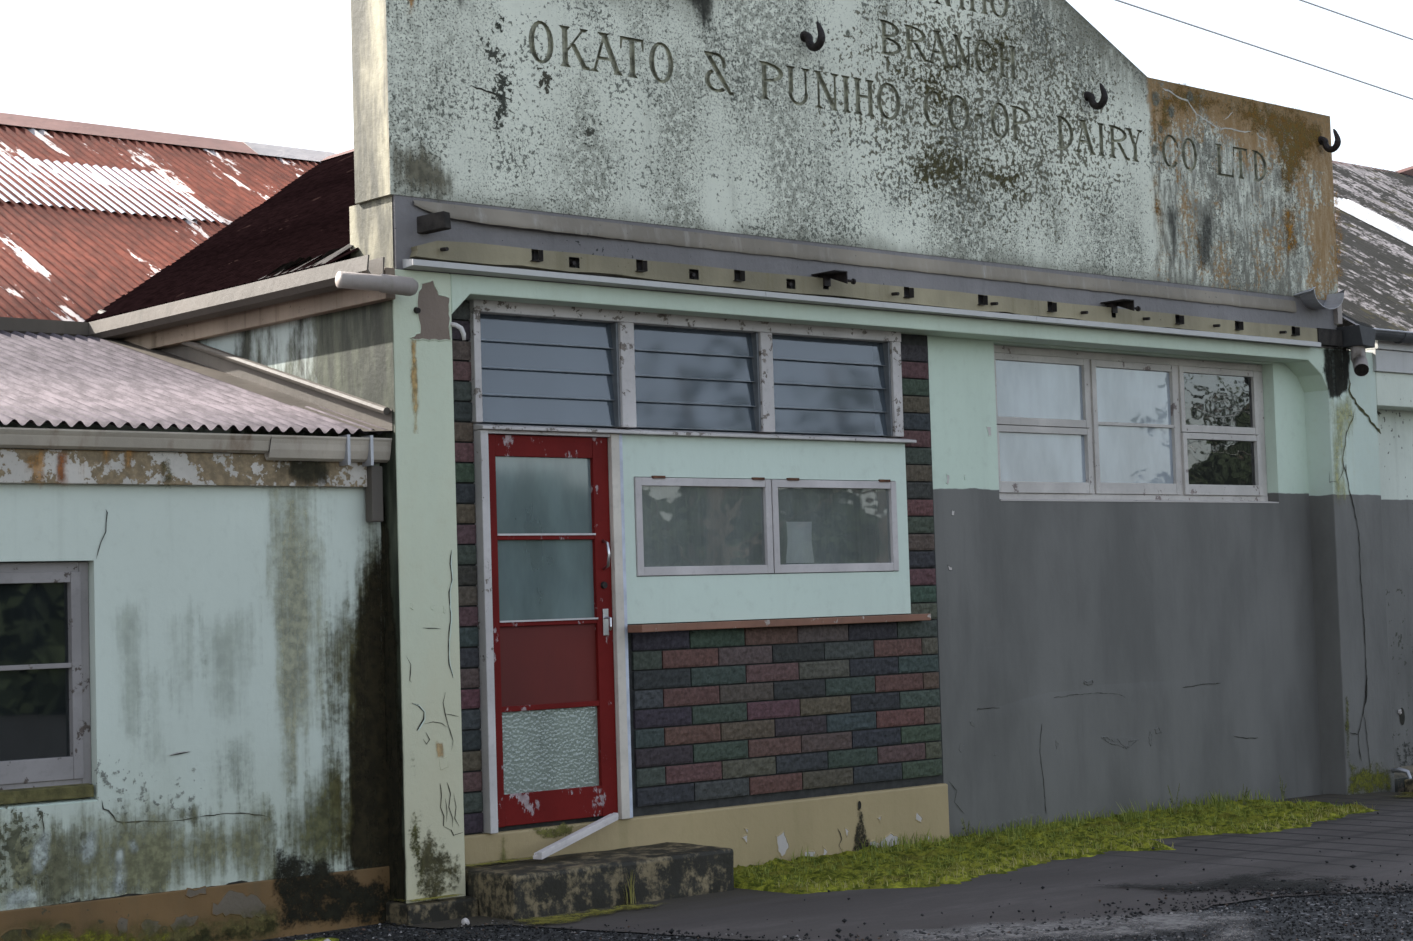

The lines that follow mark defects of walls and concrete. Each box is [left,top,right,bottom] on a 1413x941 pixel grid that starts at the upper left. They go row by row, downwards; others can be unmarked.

leakage [475,14,516,139]
leakage [533,63,555,101]
leakage [1198,216,1211,265]
leakage [186,496,406,941]
leakage [95,762,195,828]
peeling [775,830,828,858]